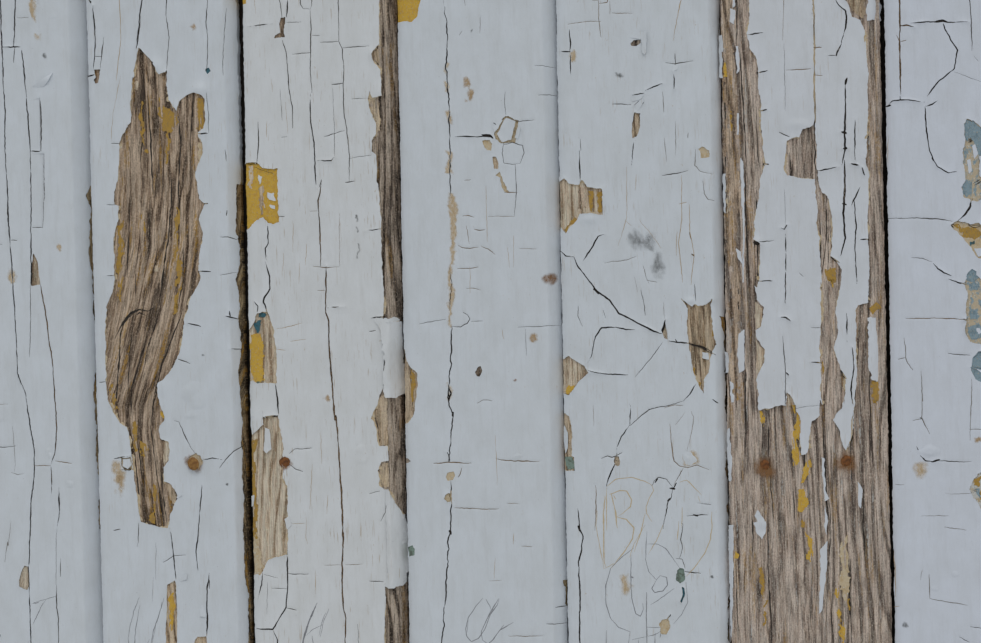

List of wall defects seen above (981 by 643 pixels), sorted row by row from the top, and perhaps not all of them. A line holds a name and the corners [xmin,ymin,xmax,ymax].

crack [0,0,72,643]
peeling [86,48,207,528]
peeling [236,163,291,643]
crack [226,0,383,643]
peeling [368,0,421,643]
crack [421,0,531,643]
peeling [560,179,603,233]
crack [502,60,715,377]
crack [555,386,718,643]
peeling [681,0,892,643]
crack [885,0,981,173]
peeling [961,269,981,382]